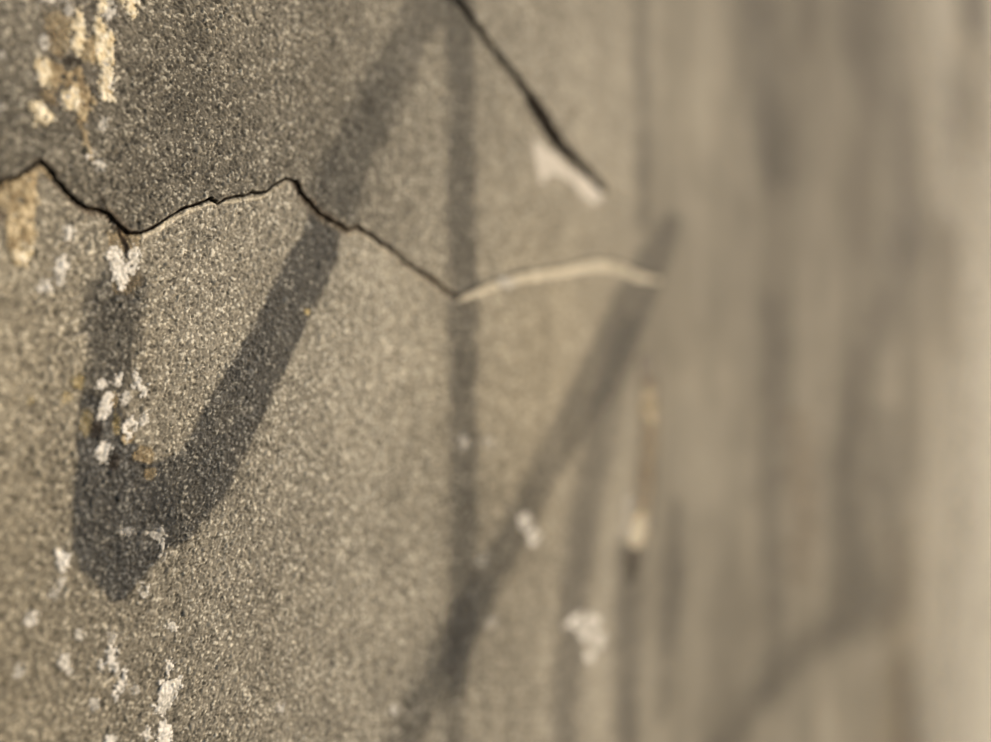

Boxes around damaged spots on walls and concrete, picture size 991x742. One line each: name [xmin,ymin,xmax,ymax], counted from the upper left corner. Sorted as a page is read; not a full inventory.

peeling [28,0,140,172]
crack [454,0,604,191]
crack [0,160,662,302]